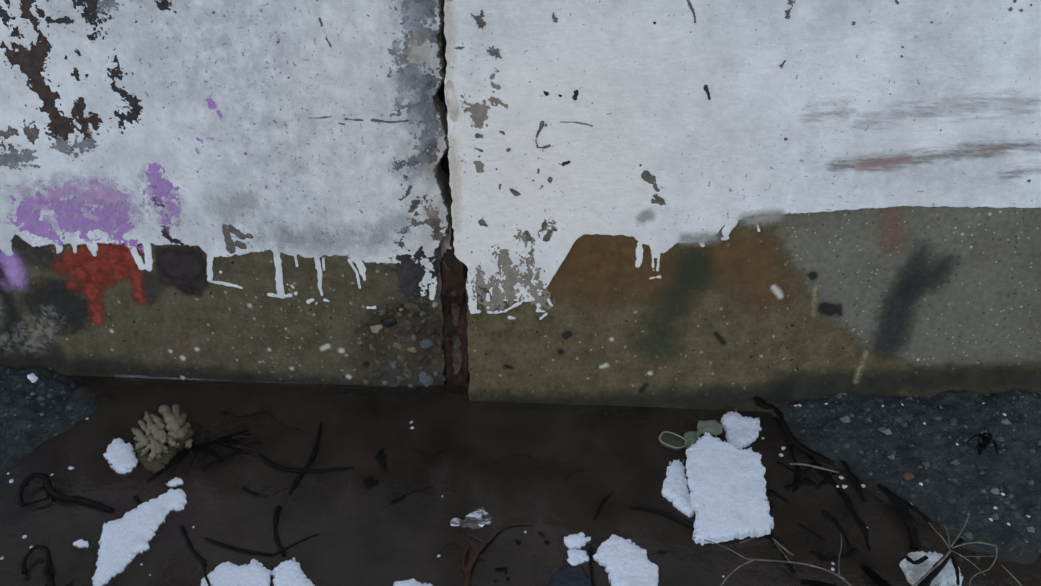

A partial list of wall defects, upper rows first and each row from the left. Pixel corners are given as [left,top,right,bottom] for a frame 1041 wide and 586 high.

peeling [0,0,143,175]
peeling [154,0,177,18]
crack [437,0,454,248]
corrosion [441,248,470,397]